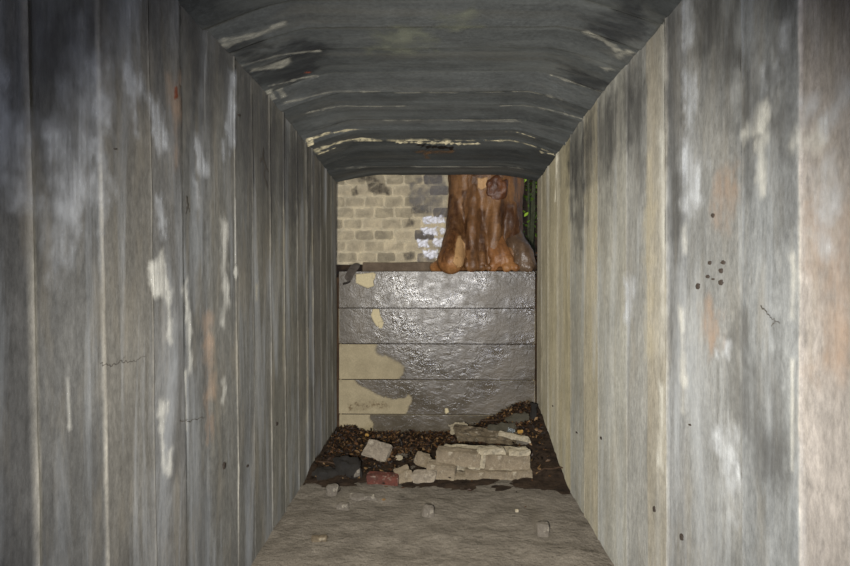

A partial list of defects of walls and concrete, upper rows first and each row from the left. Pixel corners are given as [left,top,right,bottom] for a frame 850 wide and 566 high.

spalling [307,129,375,154]
spalling [397,140,479,150]
peeling [356,272,376,288]
peeling [371,309,384,328]